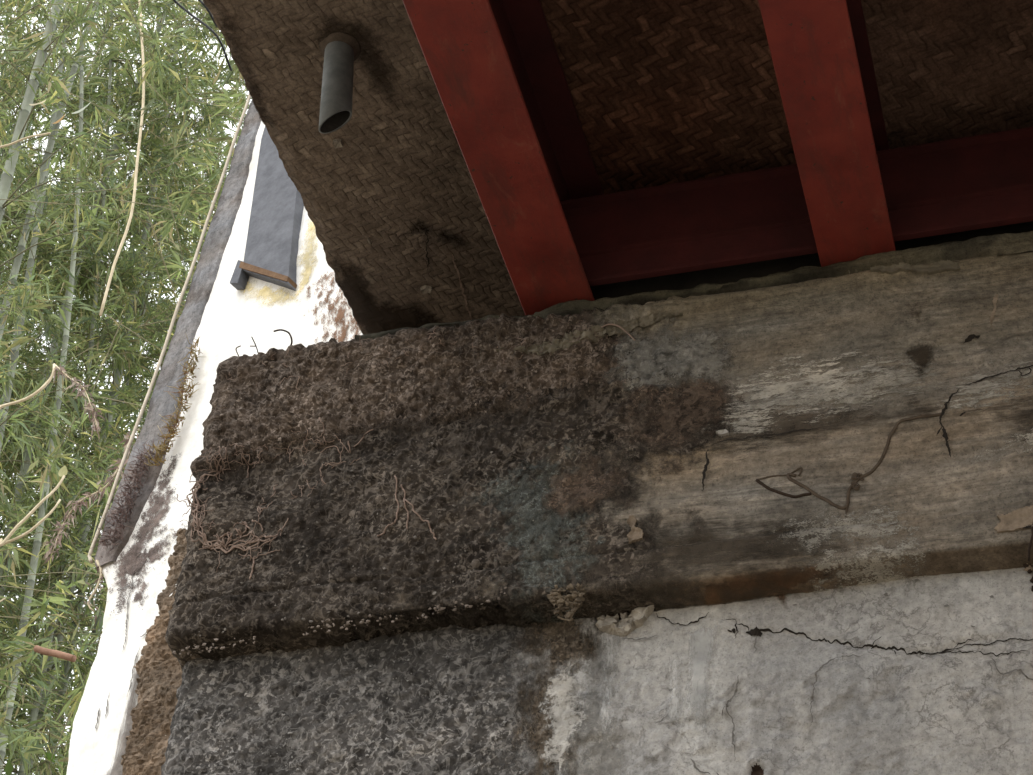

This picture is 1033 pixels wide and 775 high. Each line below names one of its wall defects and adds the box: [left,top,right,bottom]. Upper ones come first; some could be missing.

damp [318,18,393,97]
crack [892,365,1033,457]
damp [515,617,614,775]
flaking render [595,605,654,637]
crack [691,675,739,775]
crack [621,612,1033,723]